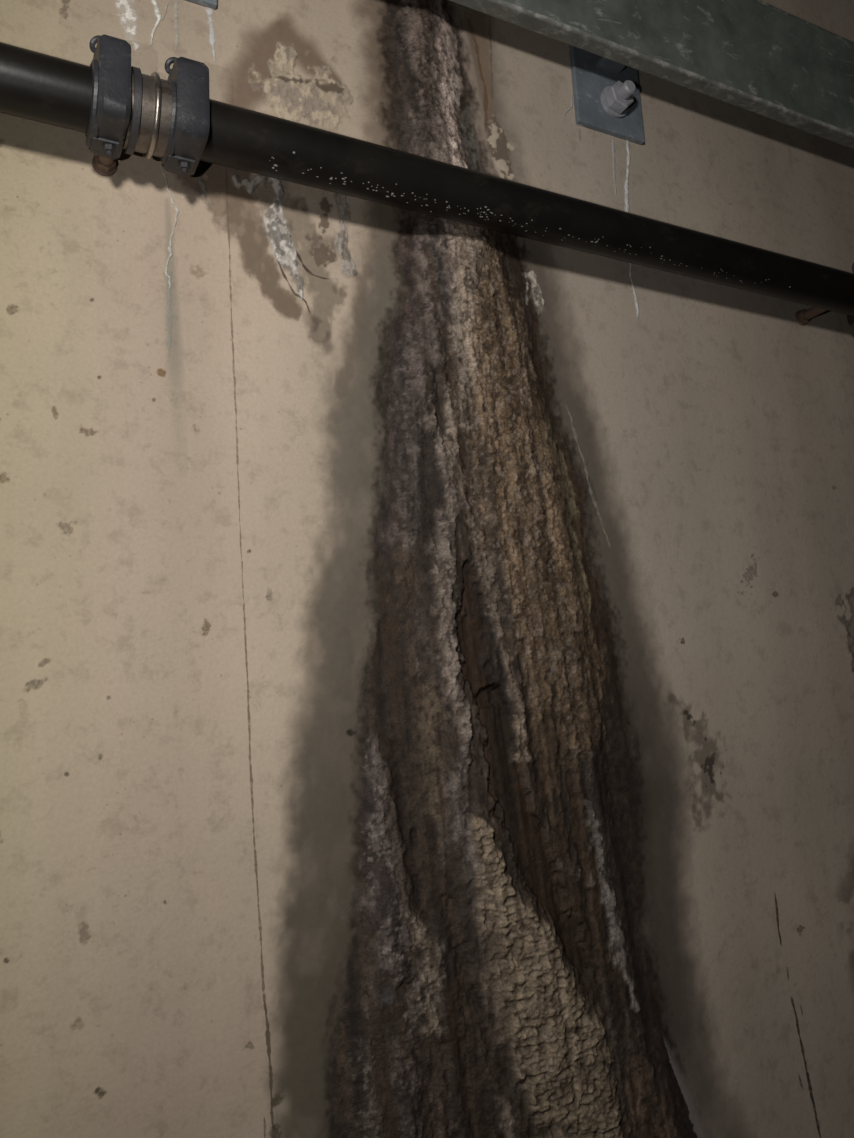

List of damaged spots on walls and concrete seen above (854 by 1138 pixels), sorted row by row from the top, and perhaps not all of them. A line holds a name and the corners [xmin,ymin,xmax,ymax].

water stain [231,20,352,130]
water stain [368,0,501,178]
water stain [612,139,630,212]
water stain [162,161,712,1138]
peeling [836,588,854,671]
spalling [701,754,715,783]
crack [774,897,782,944]
crack [787,973,821,1138]